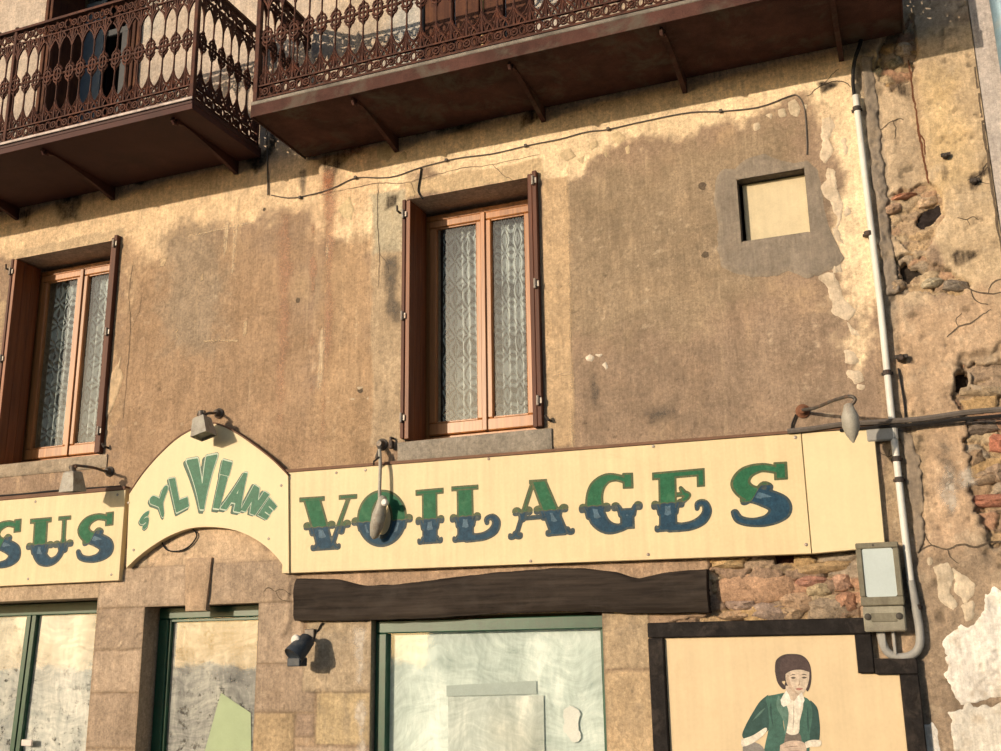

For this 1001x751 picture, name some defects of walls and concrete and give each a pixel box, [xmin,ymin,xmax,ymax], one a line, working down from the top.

leakage [321,146,363,173]
flaking render [820,117,851,244]
crack [880,60,929,183]
crack [957,67,1001,248]
leakage [385,257,399,317]
flaking render [818,263,860,336]
flaking render [886,185,969,297]
crack [947,279,1001,337]
flaking render [952,360,1001,549]
flaking render [676,551,862,622]
peeling [927,557,1001,751]
peeling [924,722,940,751]